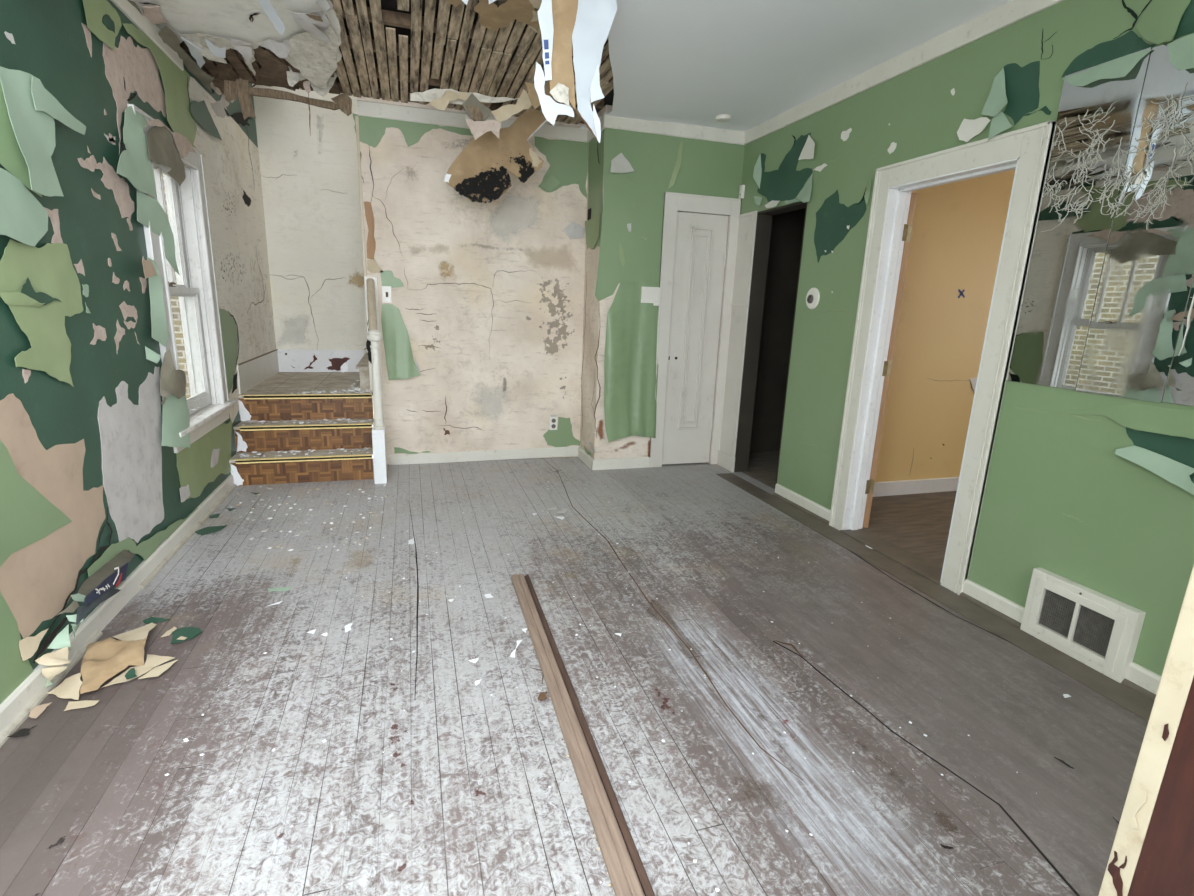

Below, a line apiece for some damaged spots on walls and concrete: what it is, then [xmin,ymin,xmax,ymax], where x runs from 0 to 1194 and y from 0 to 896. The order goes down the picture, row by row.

peeling [957,31,1055,142]
peeling [1061,0,1194,86]
peeling [360,148,383,273]
peeling [0,0,342,664]
spalling [327,357,350,372]
crack [365,322,373,364]
peeling [381,304,440,380]
crack [371,168,532,372]
peeling [526,128,872,459]
crack [409,397,485,435]
peeling [1053,403,1194,495]
peeling [1108,851,1127,896]